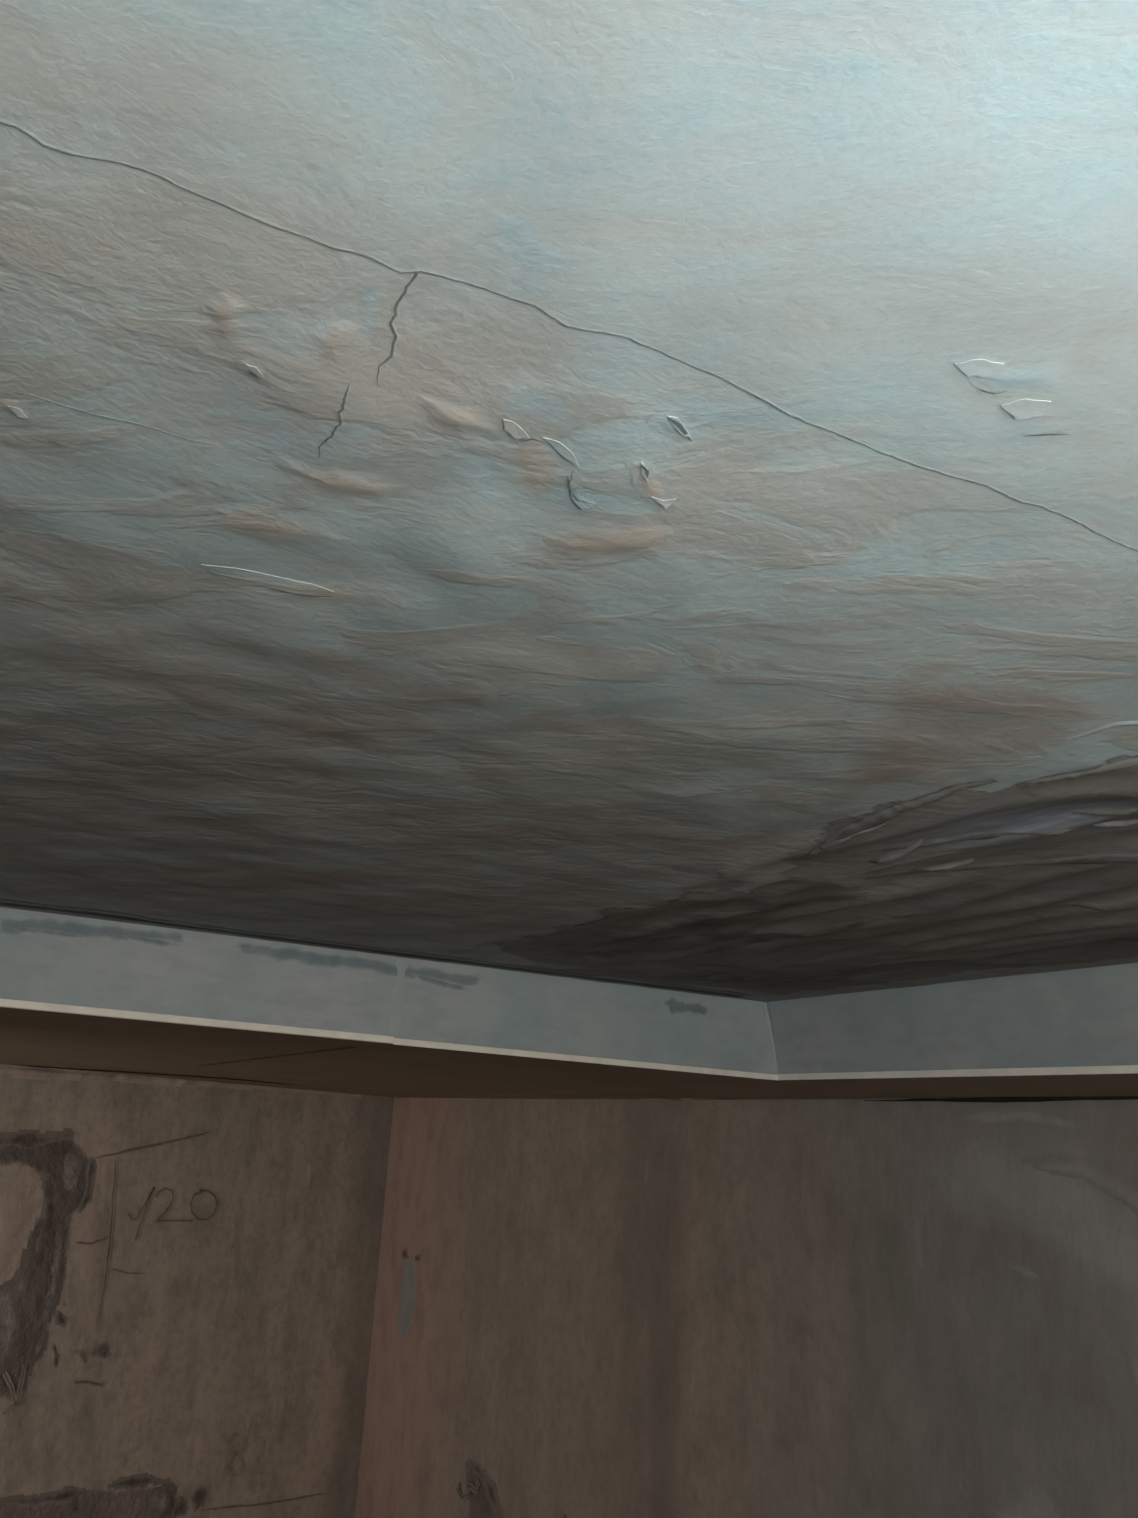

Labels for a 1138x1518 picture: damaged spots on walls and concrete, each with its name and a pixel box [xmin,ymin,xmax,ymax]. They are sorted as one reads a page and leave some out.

crack [0,119,1138,552]
leakage [0,913,193,950]
leakage [252,633,552,727]
leakage [229,667,1138,1018]